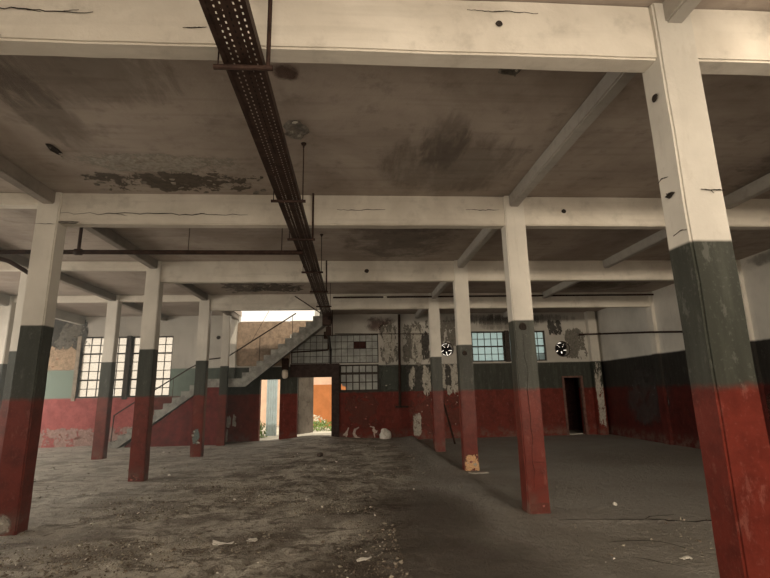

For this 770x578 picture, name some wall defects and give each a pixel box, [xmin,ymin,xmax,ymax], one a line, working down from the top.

crack [0,6,91,14]
crack [37,212,238,224]
peeling [48,319,90,370]
peeling [440,320,467,355]
peeling [547,320,588,360]
peeling [379,320,432,436]
peeling [442,363,458,403]
peeling [594,362,607,426]
spalling [465,455,480,471]
spalling [0,516,9,533]